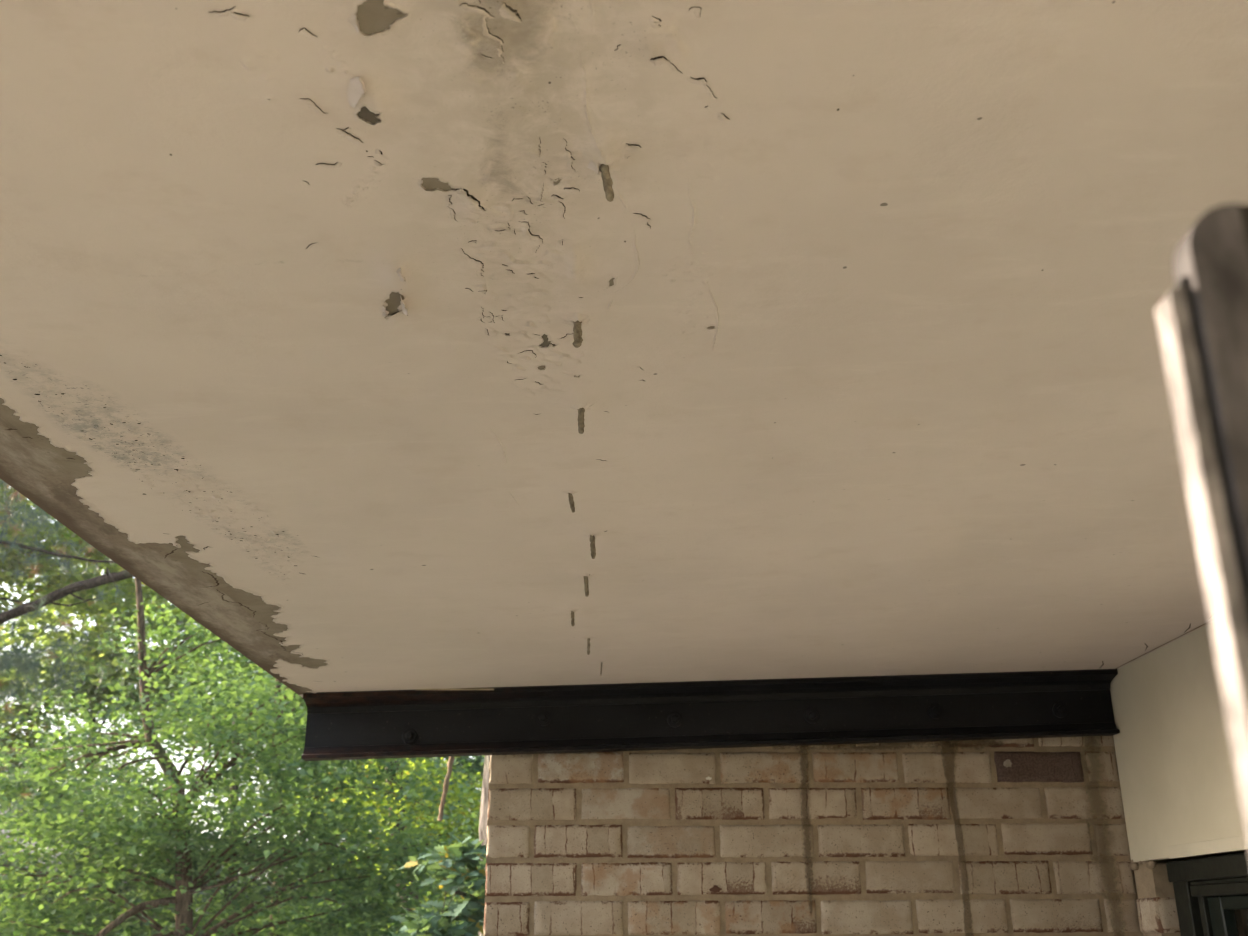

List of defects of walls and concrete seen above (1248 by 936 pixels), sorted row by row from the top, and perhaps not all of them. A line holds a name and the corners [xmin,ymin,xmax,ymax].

peeling [347,77,386,126]
peeling [347,0,412,38]
crack [649,6,730,121]
crack [445,136,580,336]
peeling [380,267,409,323]
crack [504,333,573,415]
peeling [0,390,332,695]
water stain [773,740,1003,936]